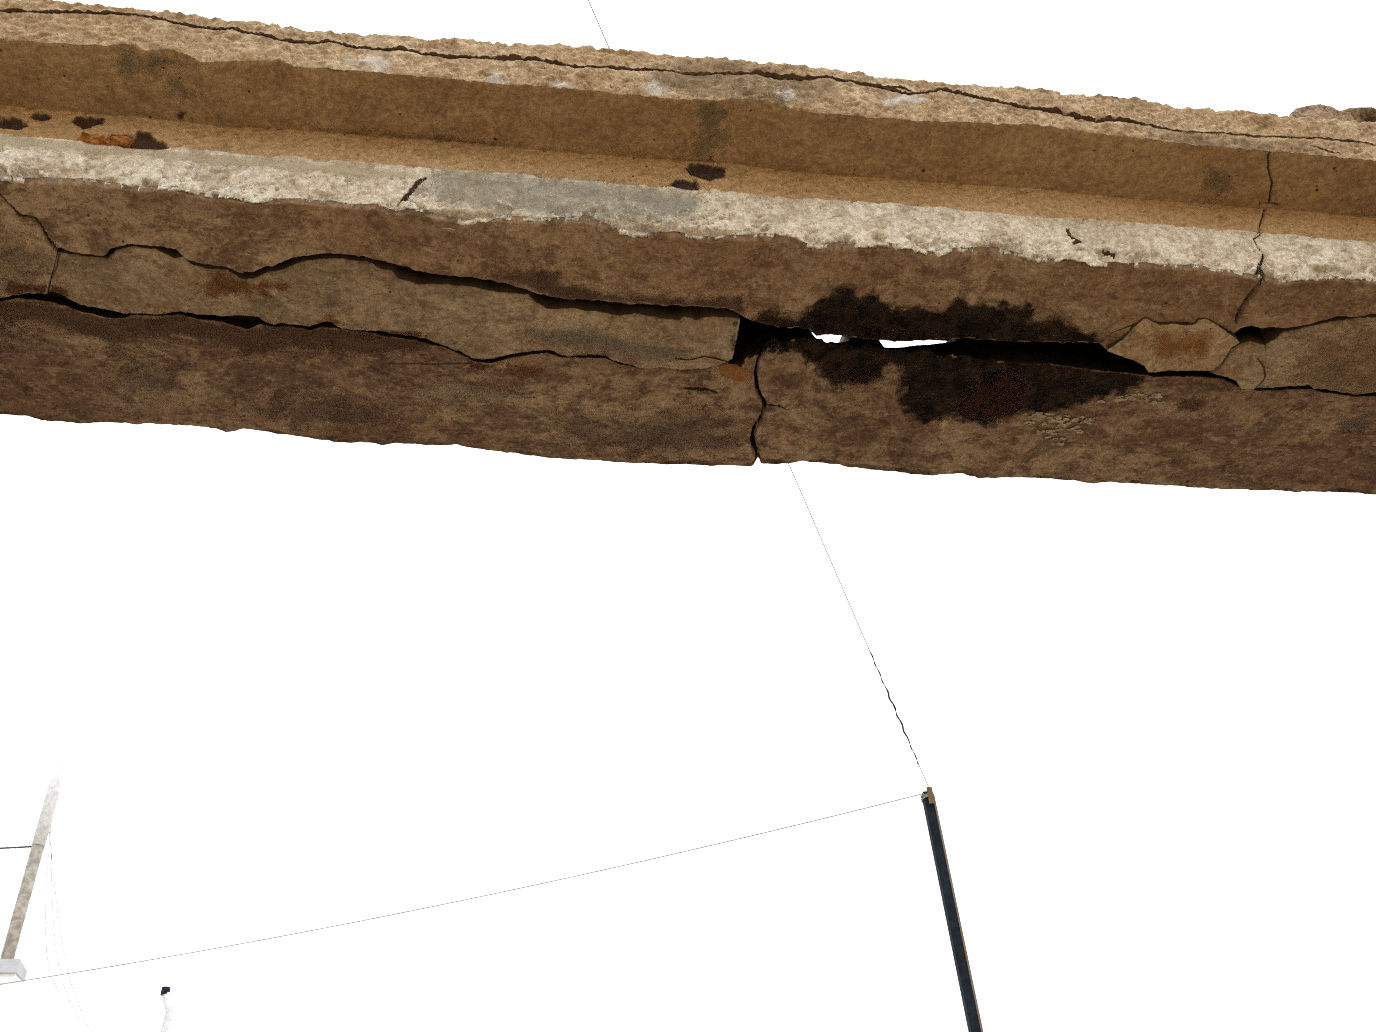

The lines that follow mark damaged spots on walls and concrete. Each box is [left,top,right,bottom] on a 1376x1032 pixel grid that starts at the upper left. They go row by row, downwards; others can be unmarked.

crack [0,8,1376,387]
crack [675,337,786,453]
water stain [755,287,1145,428]